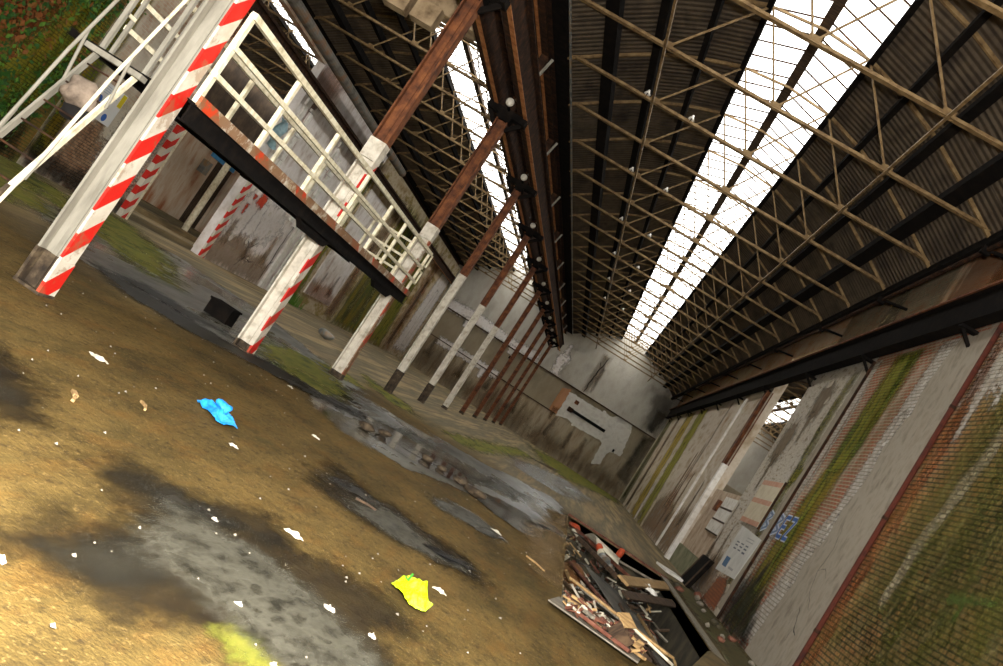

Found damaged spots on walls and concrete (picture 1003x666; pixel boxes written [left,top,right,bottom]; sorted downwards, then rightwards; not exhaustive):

leakage [33,202,63,226]
corrosion [241,194,269,214]
leakage [80,231,571,541]
peeling [556,392,632,464]
leakage [528,395,672,489]
leakage [634,454,704,553]
leakage [718,338,960,646]